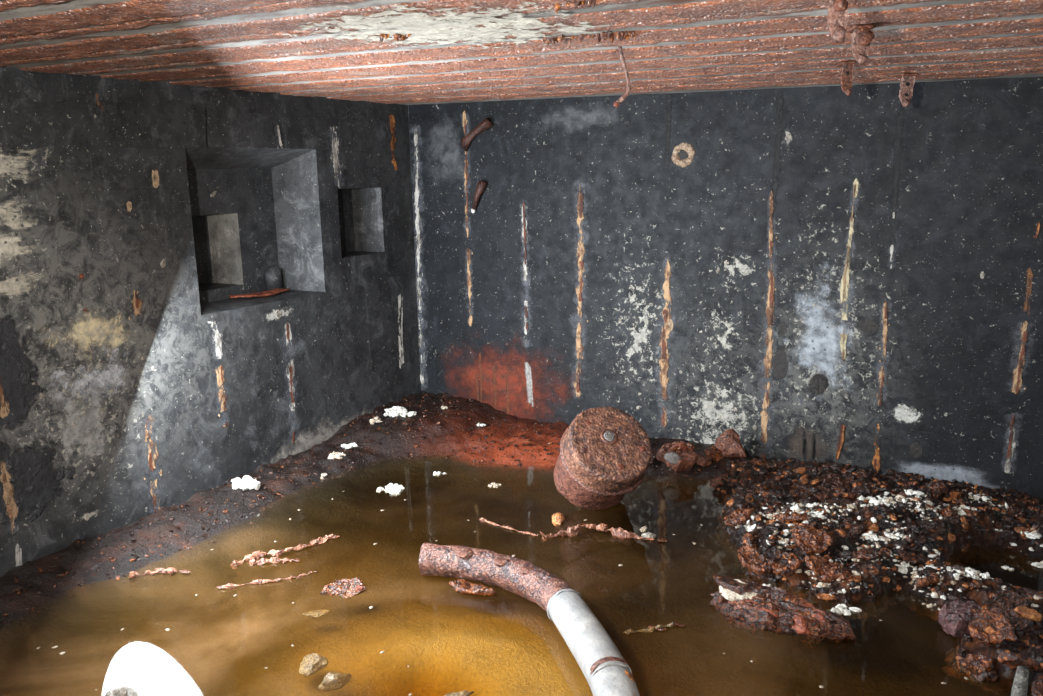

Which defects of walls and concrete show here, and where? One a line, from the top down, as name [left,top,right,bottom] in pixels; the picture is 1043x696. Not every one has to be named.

rust [379,33,408,43]
rust [552,0,608,13]
rust [543,31,638,46]
damp [771,276,883,394]
rust [451,353,543,418]
rust [0,461,18,534]